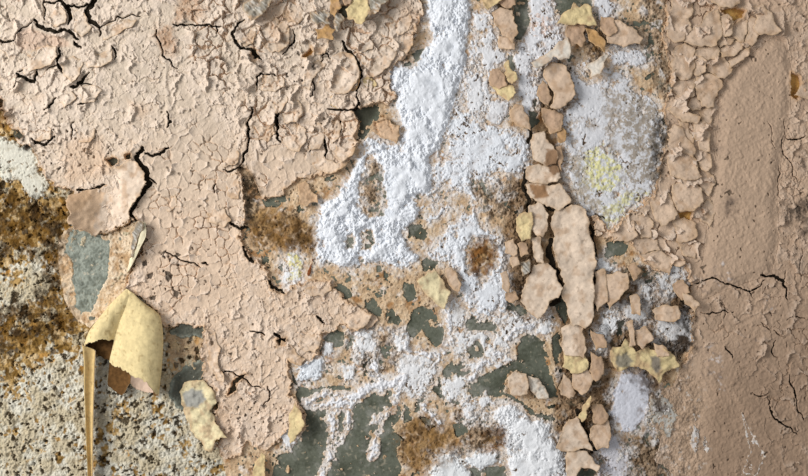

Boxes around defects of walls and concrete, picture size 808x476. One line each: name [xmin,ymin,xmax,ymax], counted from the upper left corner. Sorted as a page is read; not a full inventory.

damp [0,137,72,352]
crack [0,0,141,146]
crack [129,146,169,221]
crack [155,19,276,88]
crack [213,107,254,193]
peeling [0,0,604,476]
crack [309,40,363,158]
damp [240,0,567,476]
damp [593,0,617,21]
damp [560,49,669,229]
peeling [463,0,785,476]
crack [695,256,802,299]